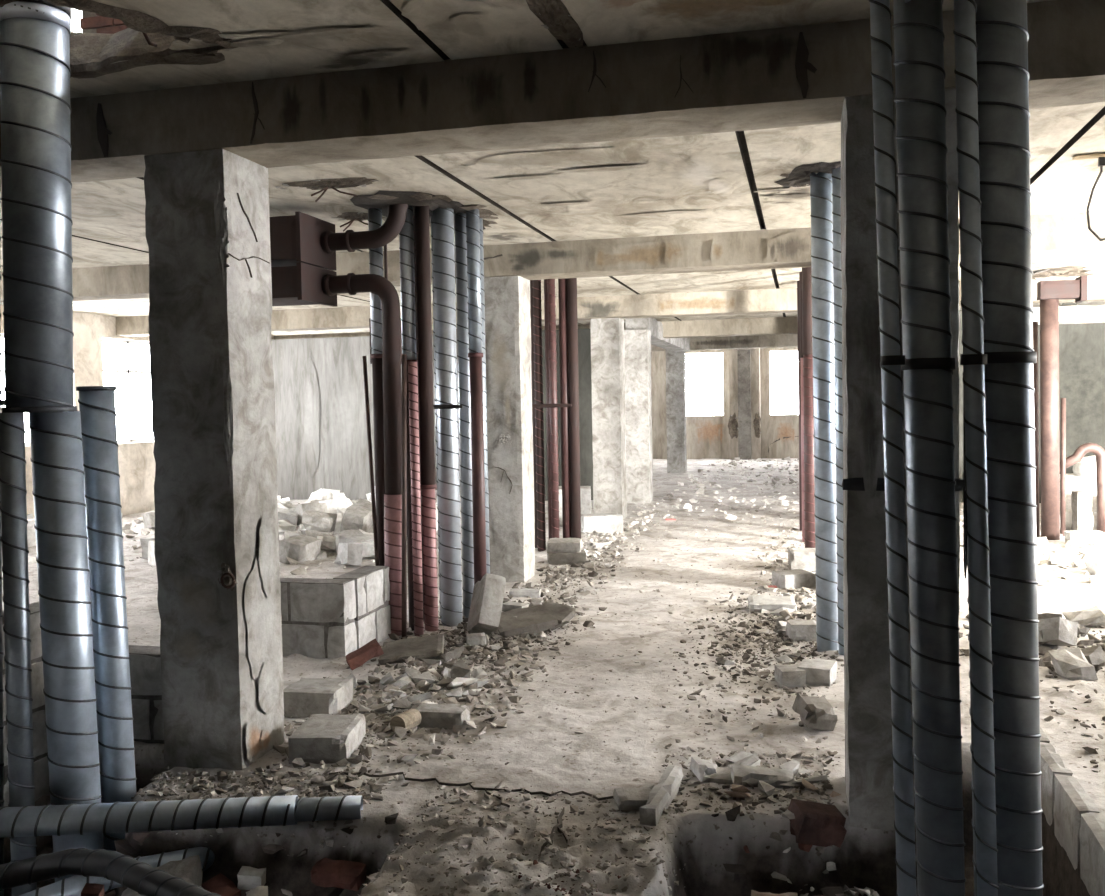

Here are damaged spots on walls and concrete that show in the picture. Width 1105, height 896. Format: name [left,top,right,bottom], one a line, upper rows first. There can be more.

spalling [45,0,238,79]
damp [402,0,505,46]
damp [230,28,431,141]
damp [453,52,541,124]
crack [330,771,614,862]